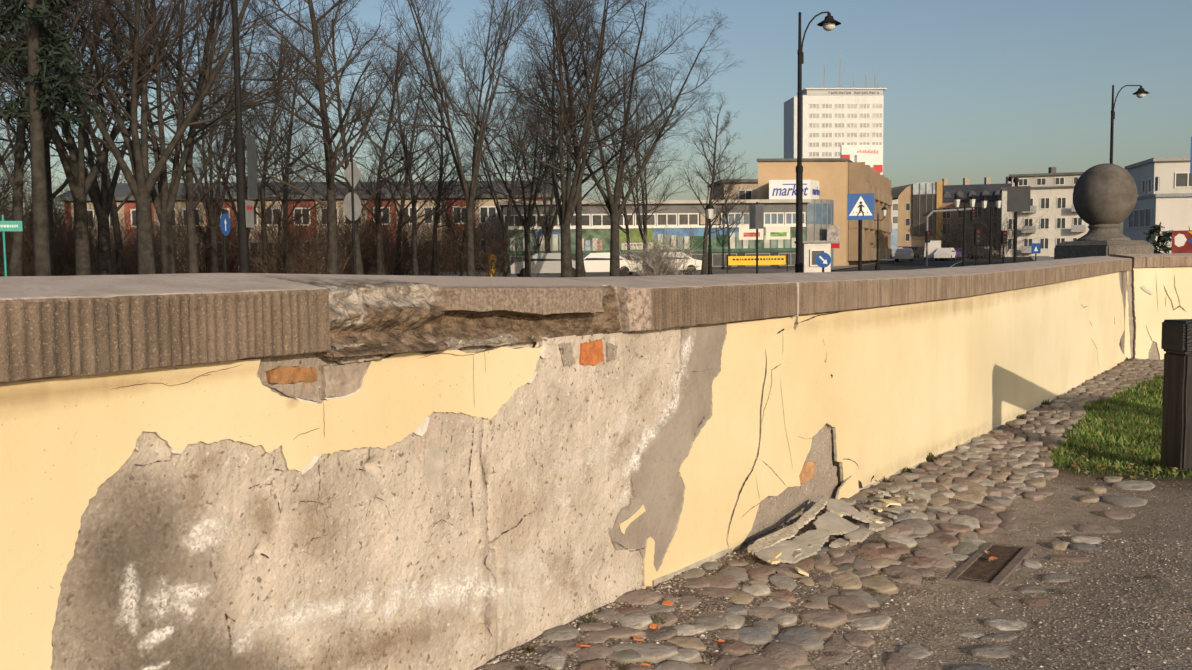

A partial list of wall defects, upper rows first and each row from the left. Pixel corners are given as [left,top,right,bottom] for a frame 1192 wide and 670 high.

crack [114,365,239,389]
spalling [50,273,729,670]
crack [728,312,839,534]
spalling [743,424,859,543]